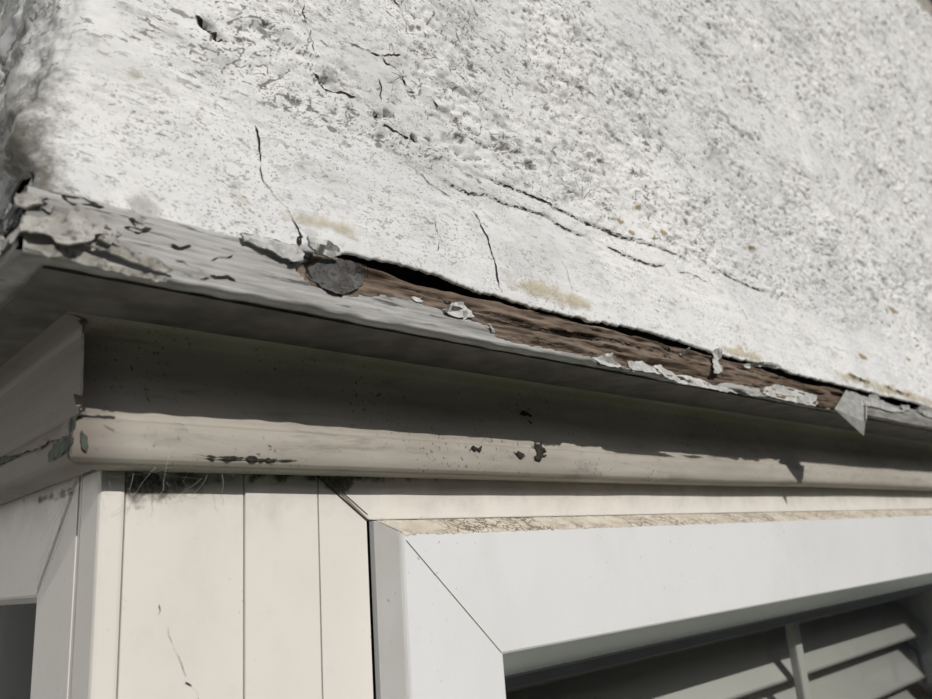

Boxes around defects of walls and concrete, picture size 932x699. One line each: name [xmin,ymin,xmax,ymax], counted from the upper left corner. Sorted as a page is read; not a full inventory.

crack [302,5,355,97]
crack [342,37,441,115]
peeling [0,191,174,284]
peeling [240,233,341,262]
crack [383,124,765,316]
peeling [442,302,474,320]
crack [392,282,707,366]
peeling [37,394,89,462]
peeling [592,352,818,406]
peeling [712,348,723,374]
peeling [834,390,932,436]